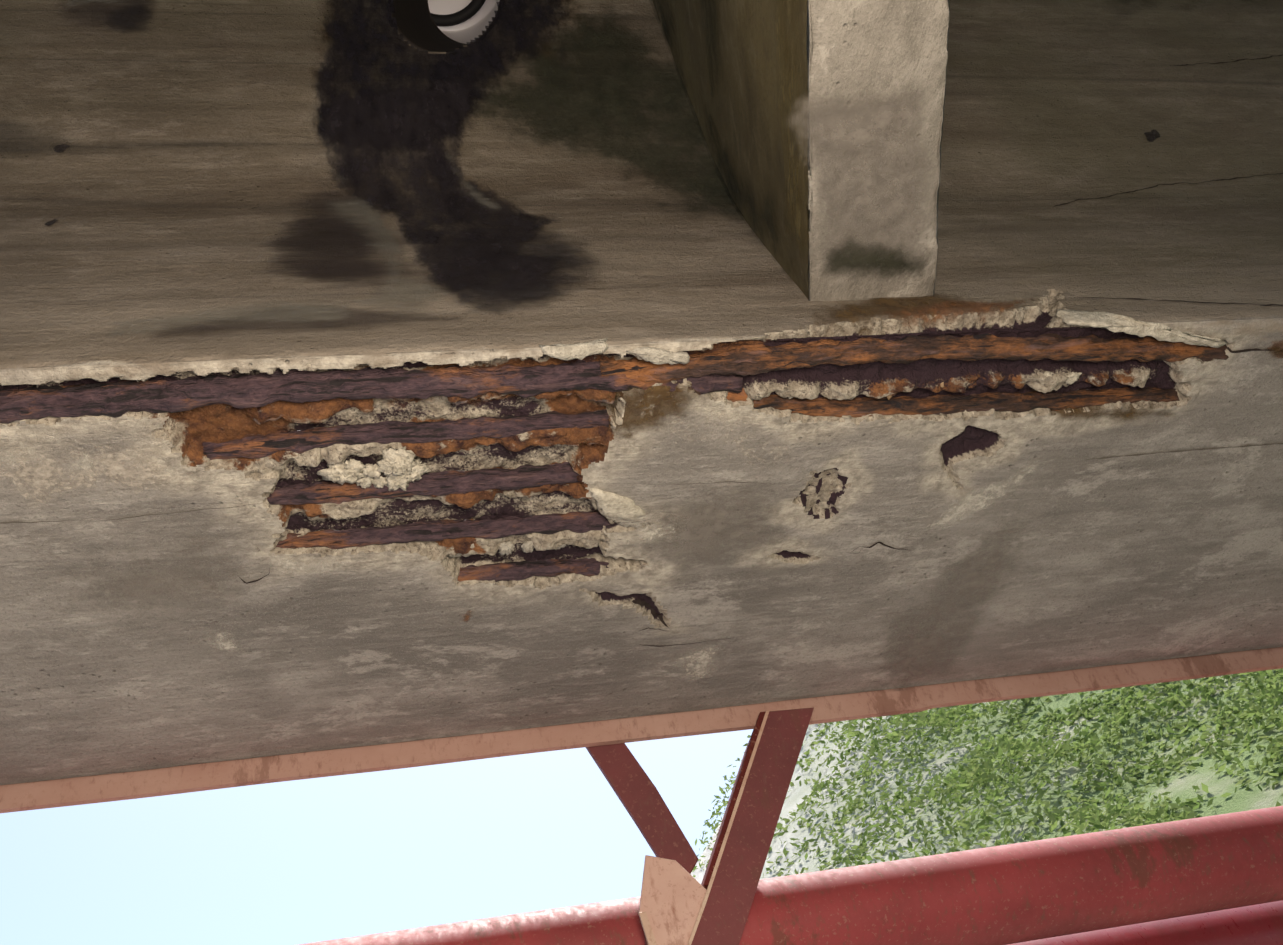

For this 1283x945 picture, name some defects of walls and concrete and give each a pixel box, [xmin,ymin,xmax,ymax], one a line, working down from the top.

leakage [281,0,775,306]
leakage [166,307,402,333]
crack [1085,297,1283,306]
crack [1224,344,1271,353]
corrosion [0,295,1229,460]
spalling [0,289,1236,490]
spalling [0,388,672,628]
corrosion [267,462,579,505]
spalling [792,468,852,519]
corrosion [276,511,618,549]
corrosion [457,558,609,582]
spalling [767,550,821,564]